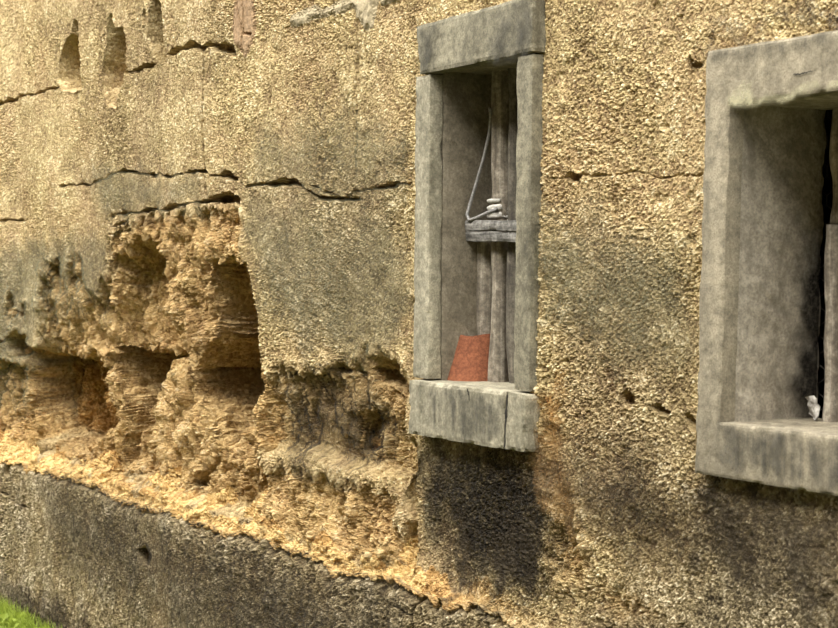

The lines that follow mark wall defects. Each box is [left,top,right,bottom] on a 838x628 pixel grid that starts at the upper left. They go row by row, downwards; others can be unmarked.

crack [0,86,61,106]
crack [126,39,236,106]
crack [60,163,412,235]
crack [553,169,703,180]
spalling [0,196,420,573]
spalling [684,412,697,432]
spalling [533,388,693,628]